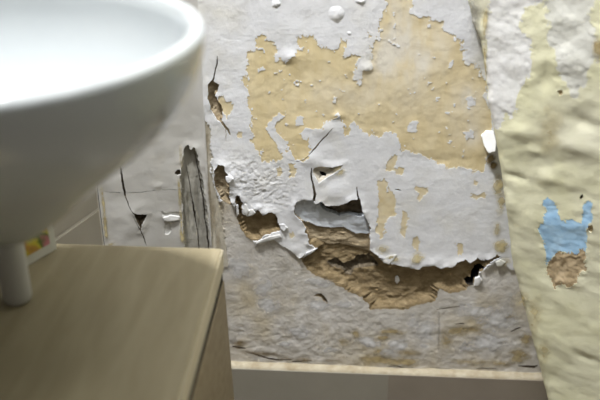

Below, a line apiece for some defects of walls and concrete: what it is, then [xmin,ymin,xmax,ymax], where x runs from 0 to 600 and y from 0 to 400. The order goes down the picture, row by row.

crack [120,170,146,244]
crack [297,116,341,201]
peeling [161,0,599,373]